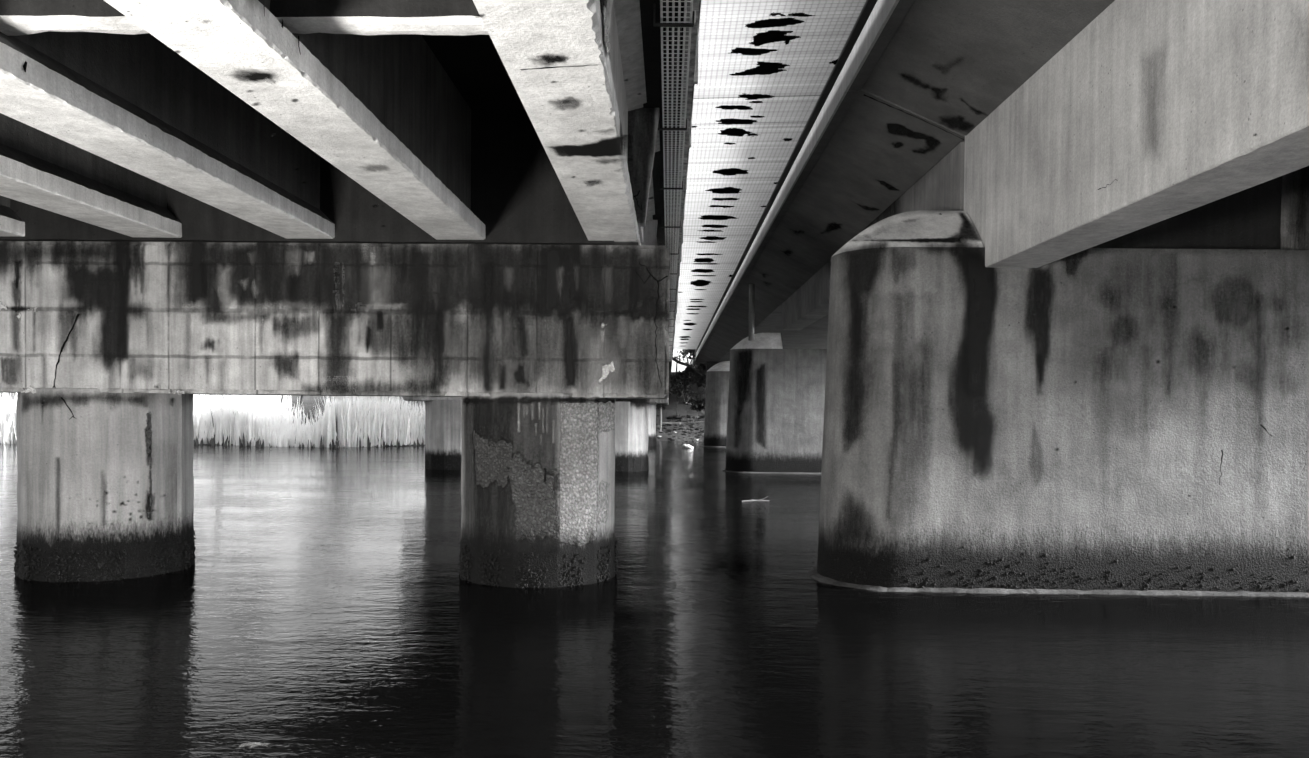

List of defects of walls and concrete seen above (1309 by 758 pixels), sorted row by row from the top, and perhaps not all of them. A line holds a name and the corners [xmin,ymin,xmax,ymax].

water stain [550,107,655,225]
water stain [900,74,945,99]
water stain [864,94,983,154]
crack [53,314,80,420]
water stain [0,239,144,382]
water stain [22,394,147,410]
water stain [175,240,670,558]
water stain [735,350,766,447]
water stain [843,180,998,471]
water stain [1026,249,1087,382]
water stain [835,498,871,542]